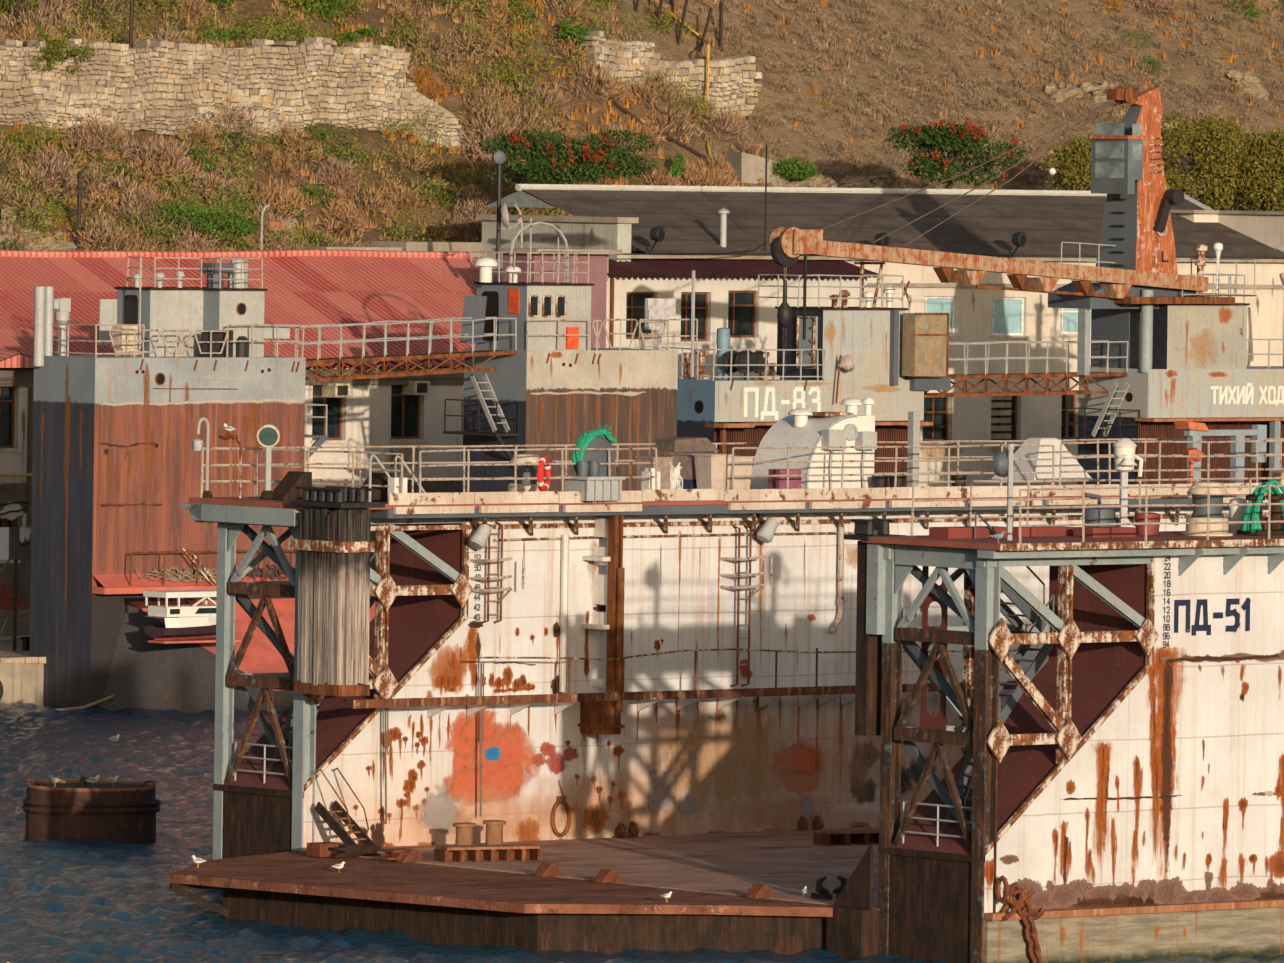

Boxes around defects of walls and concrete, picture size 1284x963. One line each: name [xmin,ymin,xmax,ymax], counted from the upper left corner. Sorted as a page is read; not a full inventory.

rust [65,365,82,567]
rust [98,366,189,509]
rust [353,715,450,847]
rust [427,621,536,734]
rust [517,819,539,841]
rust [515,622,563,727]
rust [575,734,632,833]
rust [673,697,781,757]
rust [1052,647,1186,888]
rust [1240,665,1249,702]
rust [1206,754,1284,889]